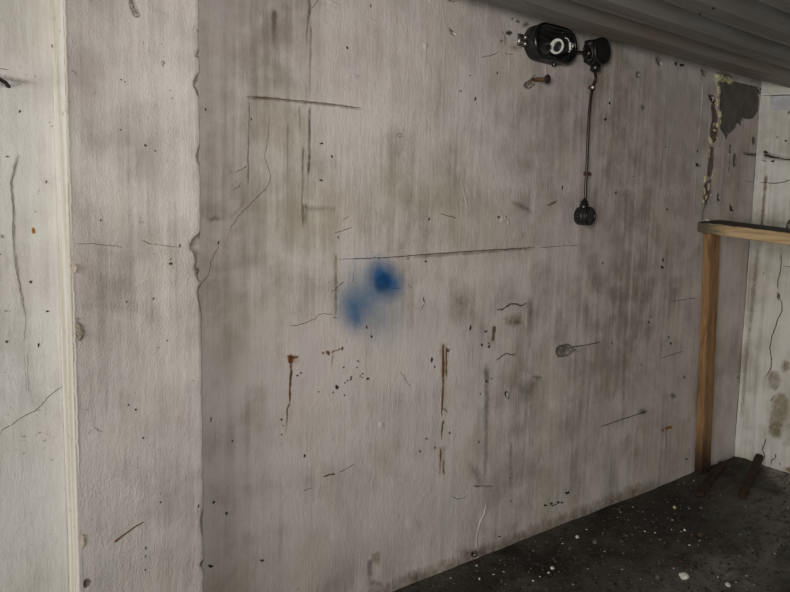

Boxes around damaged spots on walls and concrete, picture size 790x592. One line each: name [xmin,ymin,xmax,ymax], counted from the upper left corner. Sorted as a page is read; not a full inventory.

crack [201,117,271,284]
peeling [696,69,761,211]
crack [744,151,790,184]
crack [10,157,26,337]
crack [765,254,790,401]
crack [0,386,62,433]
rust [286,355,298,416]
rust [441,345,451,436]
crack [762,438,781,465]